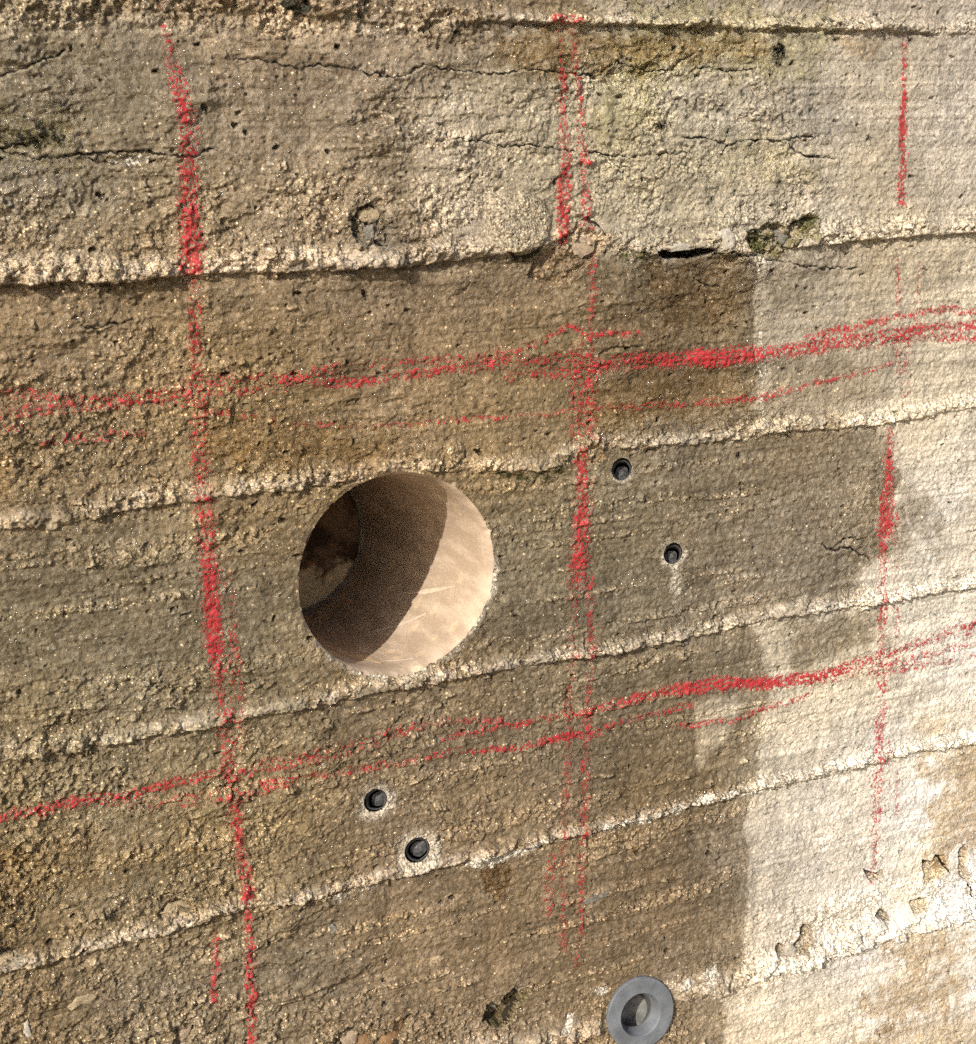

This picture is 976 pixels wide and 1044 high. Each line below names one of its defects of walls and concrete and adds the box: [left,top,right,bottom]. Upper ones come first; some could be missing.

crack [0,50,64,77]
crack [234,53,753,83]
spalling [657,212,822,261]
crack [691,248,857,293]
leakage [754,313,768,426]
leakage [597,732,955,831]
leakage [457,839,552,868]
spalling [921,844,972,897]
spalling [909,897,928,914]
spalling [775,924,815,958]
leakage [681,965,719,991]
leakage [563,1012,574,1037]